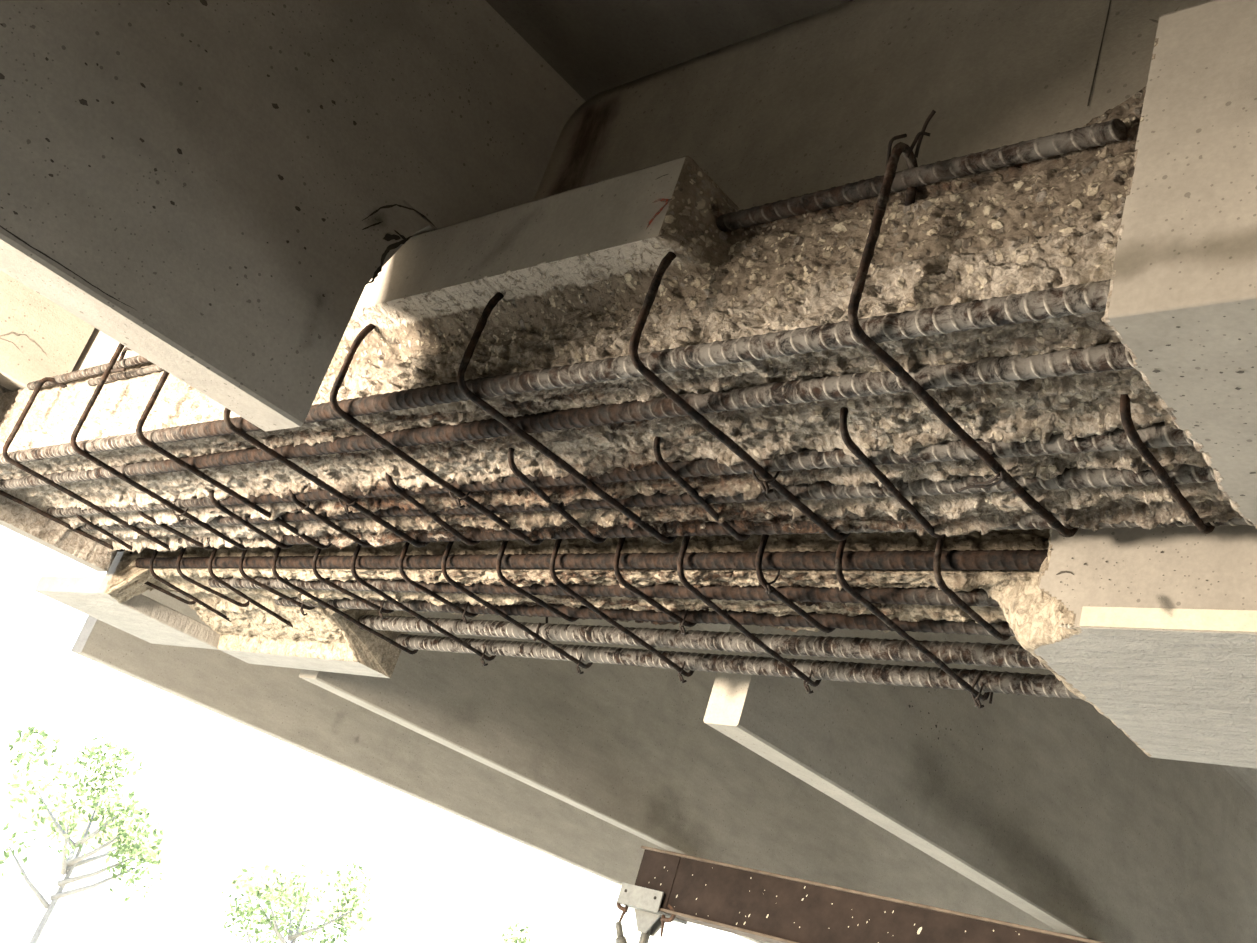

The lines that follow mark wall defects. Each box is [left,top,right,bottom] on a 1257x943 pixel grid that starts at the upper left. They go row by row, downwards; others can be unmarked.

crack [1087,0,1112,106]
crack [362,204,434,285]
spalling [0,86,1257,758]